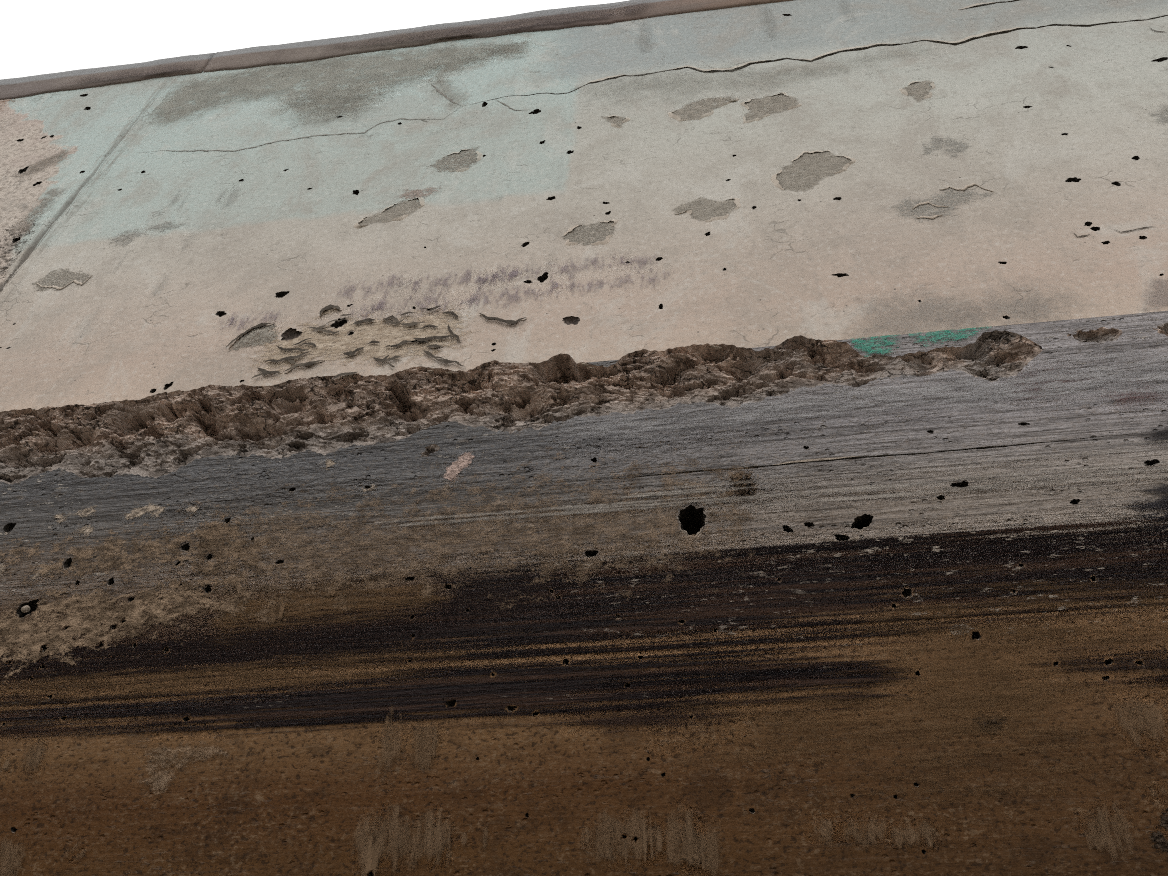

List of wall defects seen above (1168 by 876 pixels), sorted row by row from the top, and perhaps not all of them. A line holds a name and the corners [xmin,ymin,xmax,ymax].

crack [152,0,1168,152]
peeling [667,92,802,123]
peeling [430,146,483,172]
peeling [771,150,856,191]
peeling [353,188,437,229]
peeling [675,198,741,222]
peeling [898,183,994,220]
peeling [563,220,619,246]
peeling [32,269,92,291]
spalling [0,330,1043,485]
water stain [0,450,1168,771]